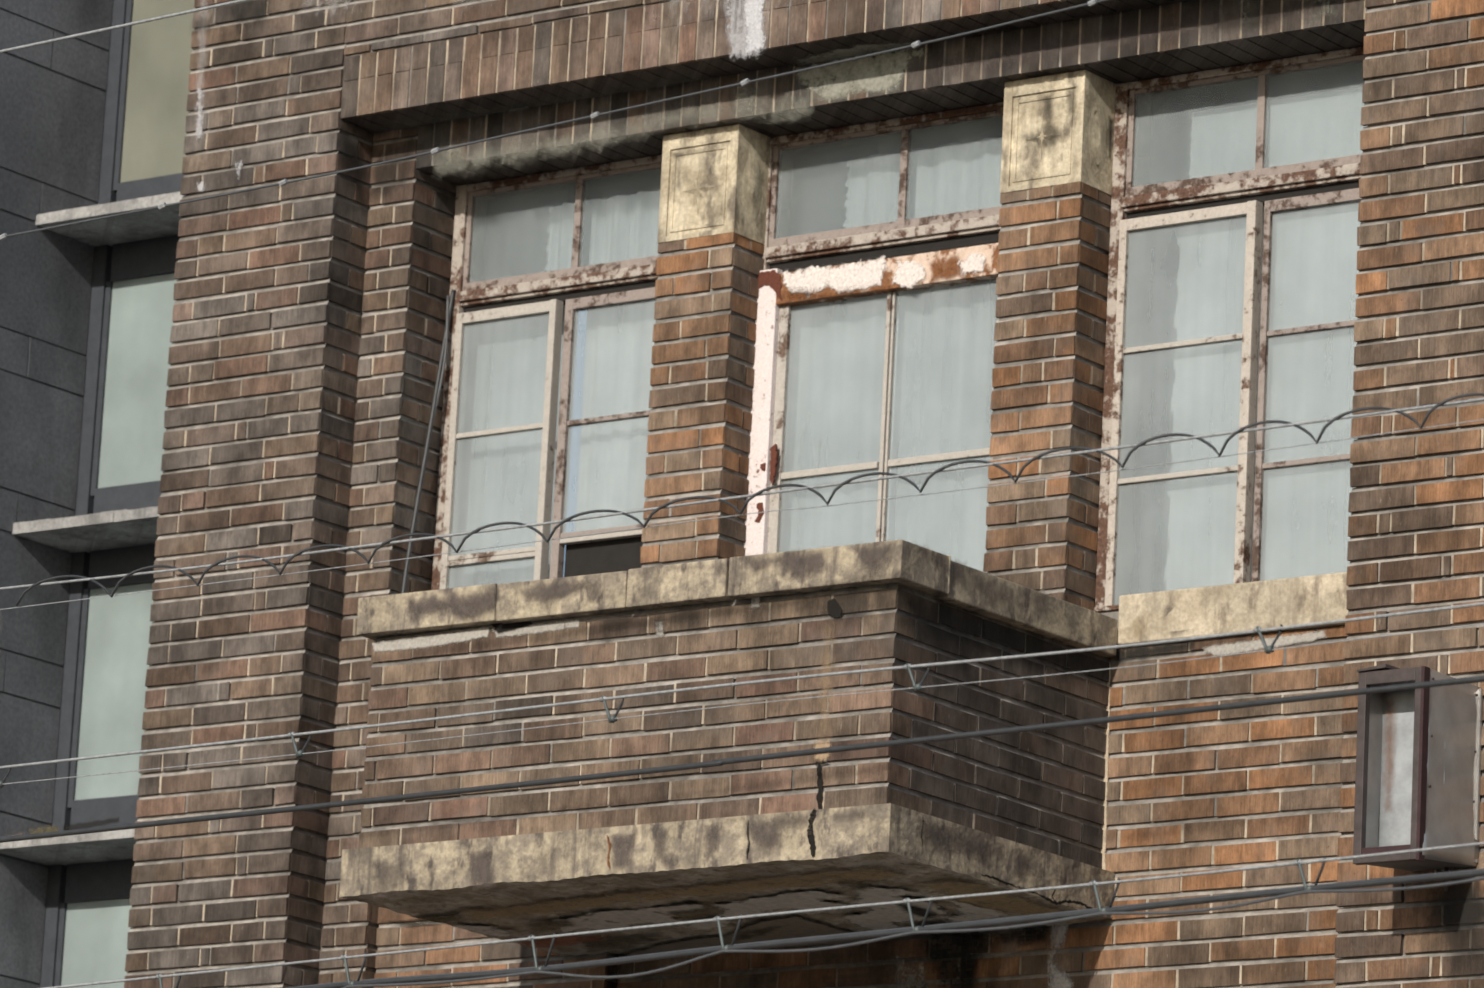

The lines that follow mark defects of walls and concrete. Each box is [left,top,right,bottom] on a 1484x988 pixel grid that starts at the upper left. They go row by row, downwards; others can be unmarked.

water stain [727,0,765,56]
peeling [756,253,985,300]
peeling [760,444,779,486]
peeling [754,503,764,522]
water stain [746,552,824,576]
water stain [857,545,889,567]
water stain [923,548,964,581]
water stain [410,591,494,618]
water stain [526,582,597,599]
water stain [910,601,1097,674]
crack [807,760,826,857]
water stain [922,924,1071,988]